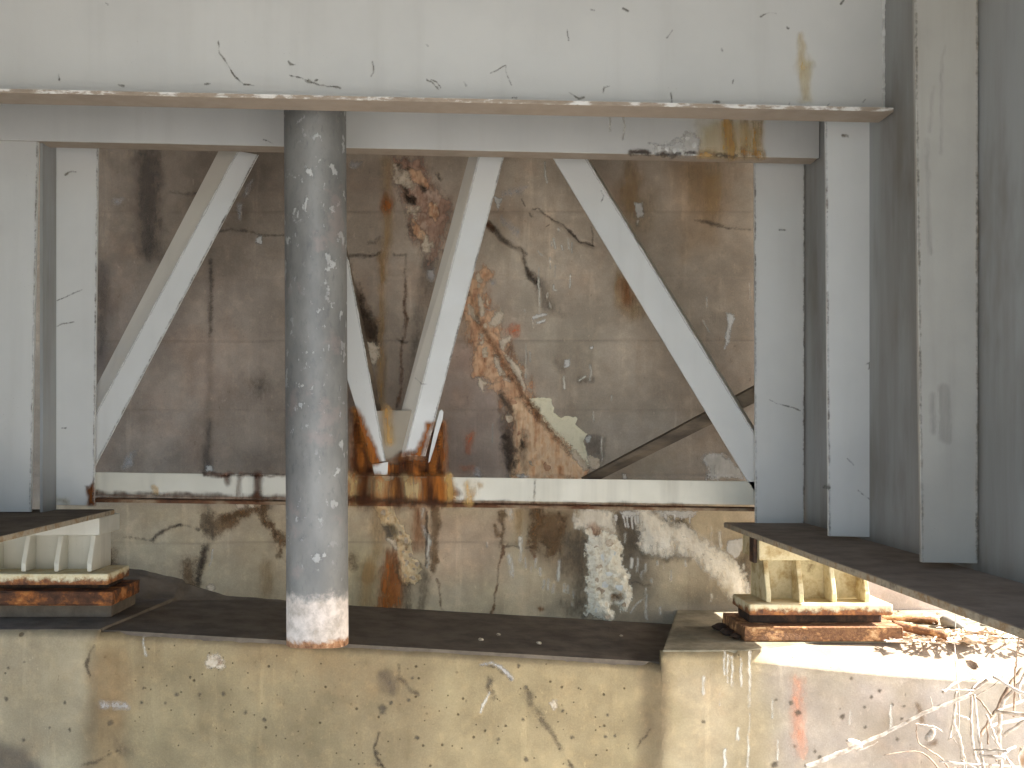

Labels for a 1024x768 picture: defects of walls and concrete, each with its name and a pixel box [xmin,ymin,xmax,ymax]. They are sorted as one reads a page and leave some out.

spalling [393,157,452,266]
crack [486,222,524,262]
crack [396,286,408,407]
spalling [463,265,600,479]
rust [86,484,228,506]
rust [203,472,283,501]
rust [348,323,517,572]
water stain [196,504,286,592]
rust [381,553,402,608]
crack [490,545,505,614]
water stain [508,508,750,621]